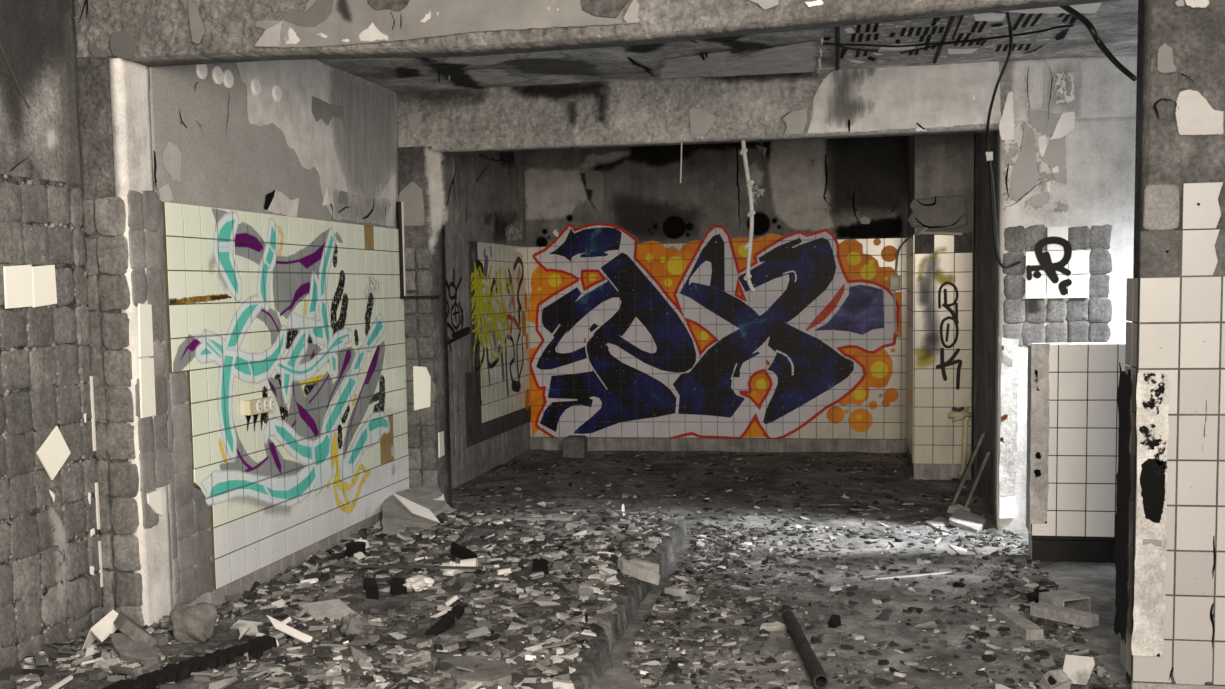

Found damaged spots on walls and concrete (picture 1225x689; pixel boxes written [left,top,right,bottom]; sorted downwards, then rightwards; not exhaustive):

peeling [283,28,300,44]
spalling [338,0,350,20]
spalling [342,0,409,42]
spalling [581,0,630,18]
spalling [818,12,1077,73]
leakage [0,0,82,190]
flaking render [159,141,182,202]
flaking render [236,59,397,227]
peeling [999,70,1079,212]